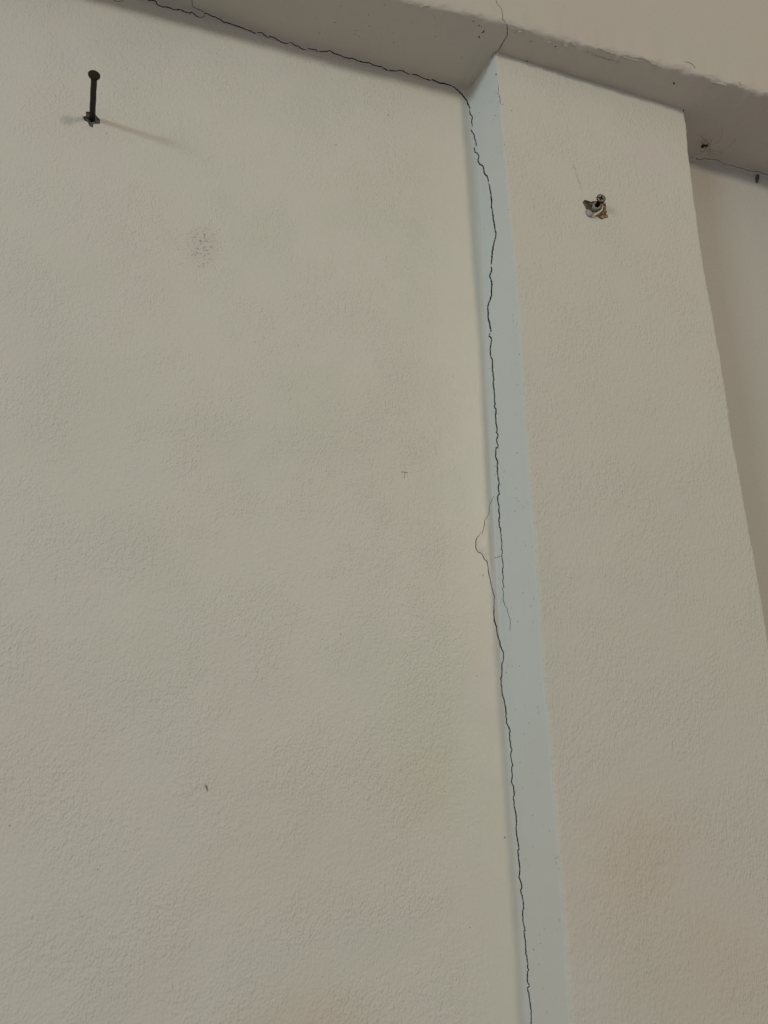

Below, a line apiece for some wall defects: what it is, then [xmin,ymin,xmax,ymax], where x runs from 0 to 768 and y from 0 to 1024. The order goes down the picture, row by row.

crack [147,0,532,1024]